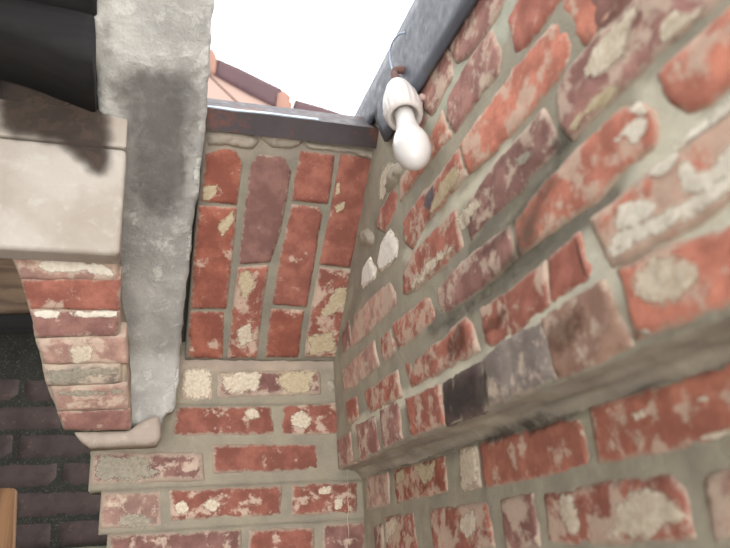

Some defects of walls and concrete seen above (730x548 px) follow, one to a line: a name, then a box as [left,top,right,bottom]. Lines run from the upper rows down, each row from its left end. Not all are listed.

water stain [0,83,109,173]
water stain [122,71,186,207]